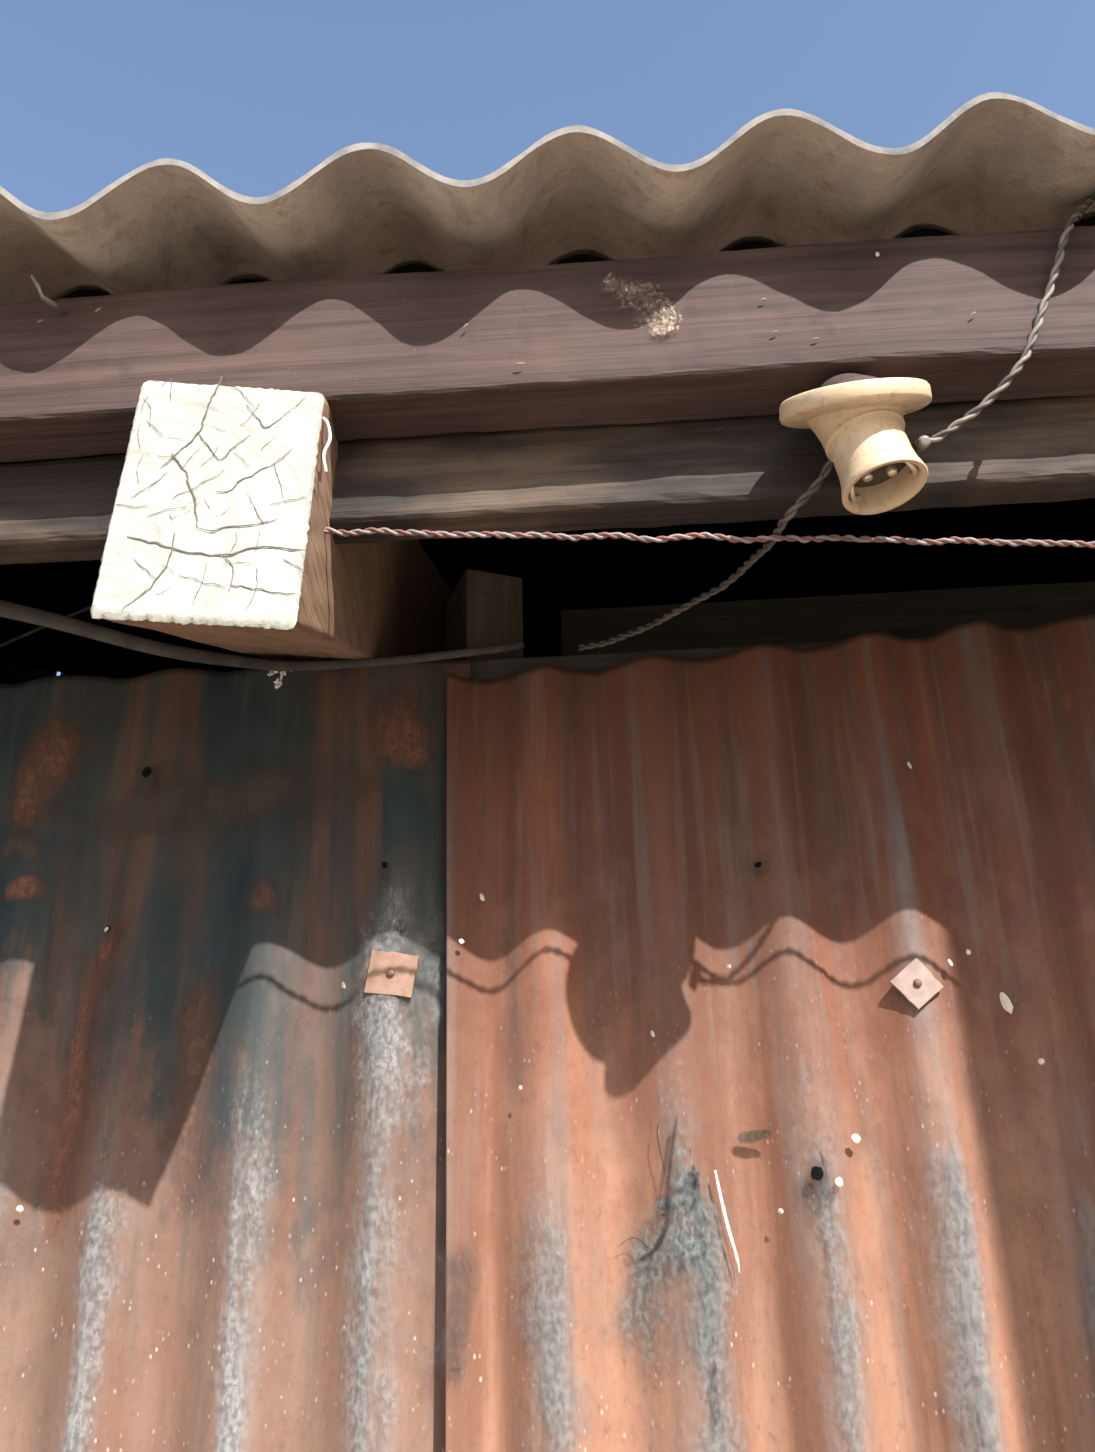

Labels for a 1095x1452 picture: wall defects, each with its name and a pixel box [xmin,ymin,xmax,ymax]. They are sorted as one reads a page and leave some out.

crack [117,376,308,610]
rust [375,699,429,768]
rust [5,875,38,898]